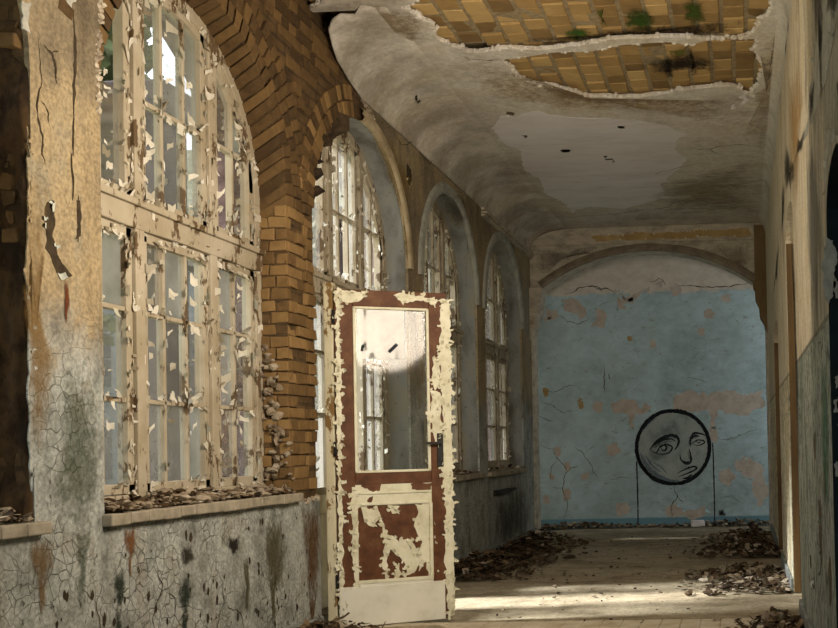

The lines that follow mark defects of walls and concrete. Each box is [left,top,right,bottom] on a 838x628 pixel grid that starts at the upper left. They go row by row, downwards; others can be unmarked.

spalling [401,0,773,110]
peeling [492,110,687,213]
damp [781,0,837,235]
spalling [0,1,42,516]
spalling [44,200,72,280]
spalling [94,0,390,520]
damp [807,169,819,296]
crack [541,445,627,515]
damp [114,572,125,628]
crack [143,550,176,628]
damp [180,580,191,628]
damp [266,524,284,619]